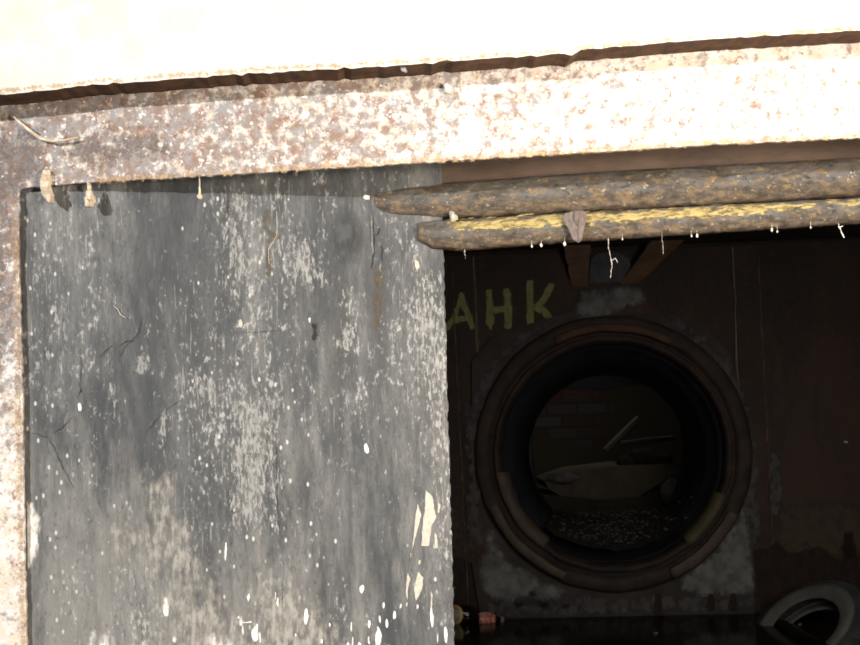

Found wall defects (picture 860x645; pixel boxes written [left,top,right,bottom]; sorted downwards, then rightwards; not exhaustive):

rust [66,133,243,183]
rust [256,151,546,171]
rust [562,138,751,153]
rust [0,129,48,370]
crack [79,319,143,395]
crack [26,418,73,486]
peeling [347,491,448,645]
peeling [238,616,261,643]